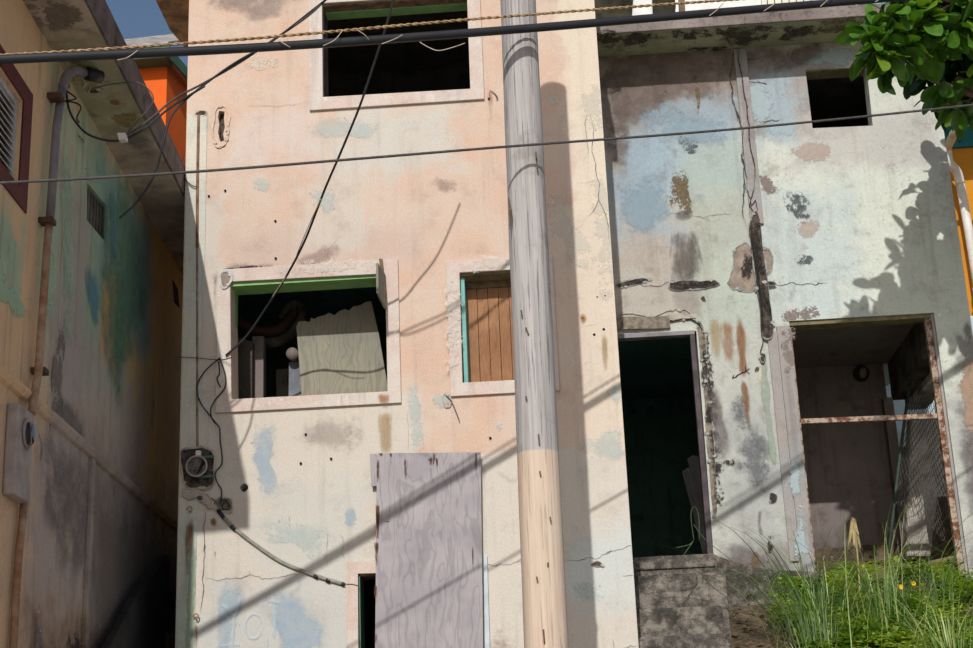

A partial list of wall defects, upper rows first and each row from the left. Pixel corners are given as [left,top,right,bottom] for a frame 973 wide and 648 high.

peeling [550,174,653,301]
spalling [616,308,717,518]
rust [713,322,749,419]
spalling [668,210,820,464]
crack [670,49,821,379]
peeling [959,357,973,443]